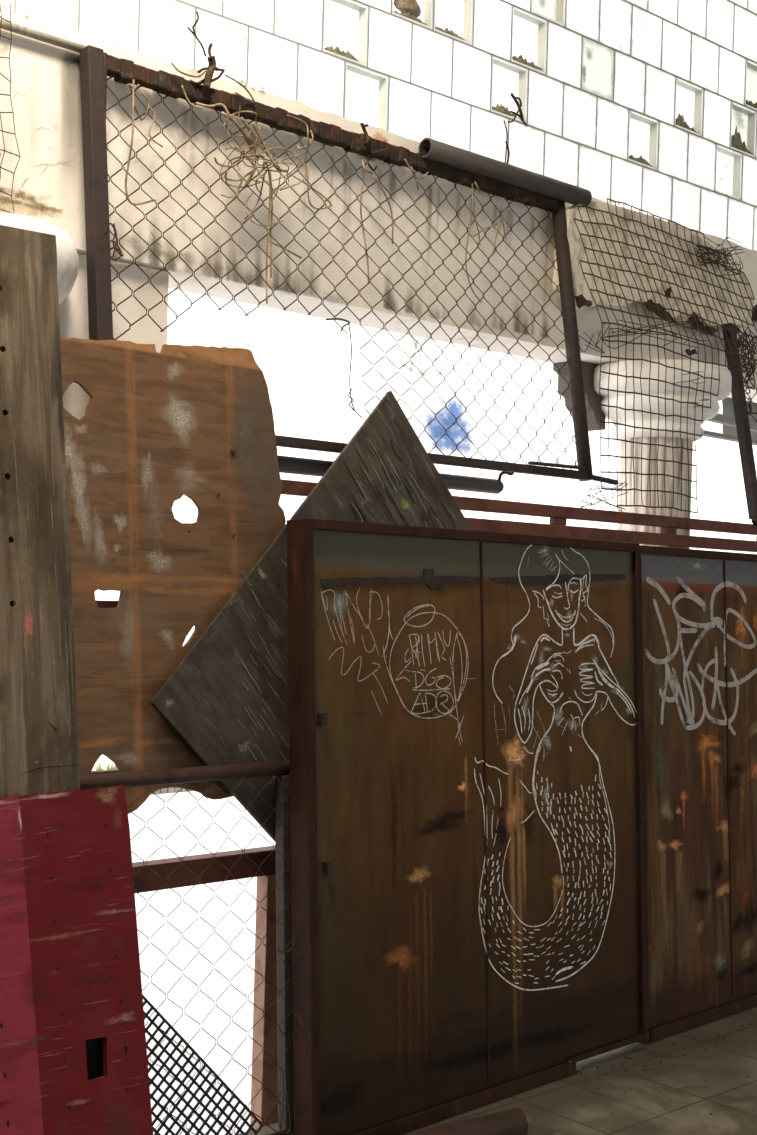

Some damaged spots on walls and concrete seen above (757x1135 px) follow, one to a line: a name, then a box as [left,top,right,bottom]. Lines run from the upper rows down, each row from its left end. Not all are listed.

peeling [0,171,60,216]
peeling [575,294,593,309]
peeling [644,287,741,345]
rust [701,737,720,782]
rust [658,841,681,877]